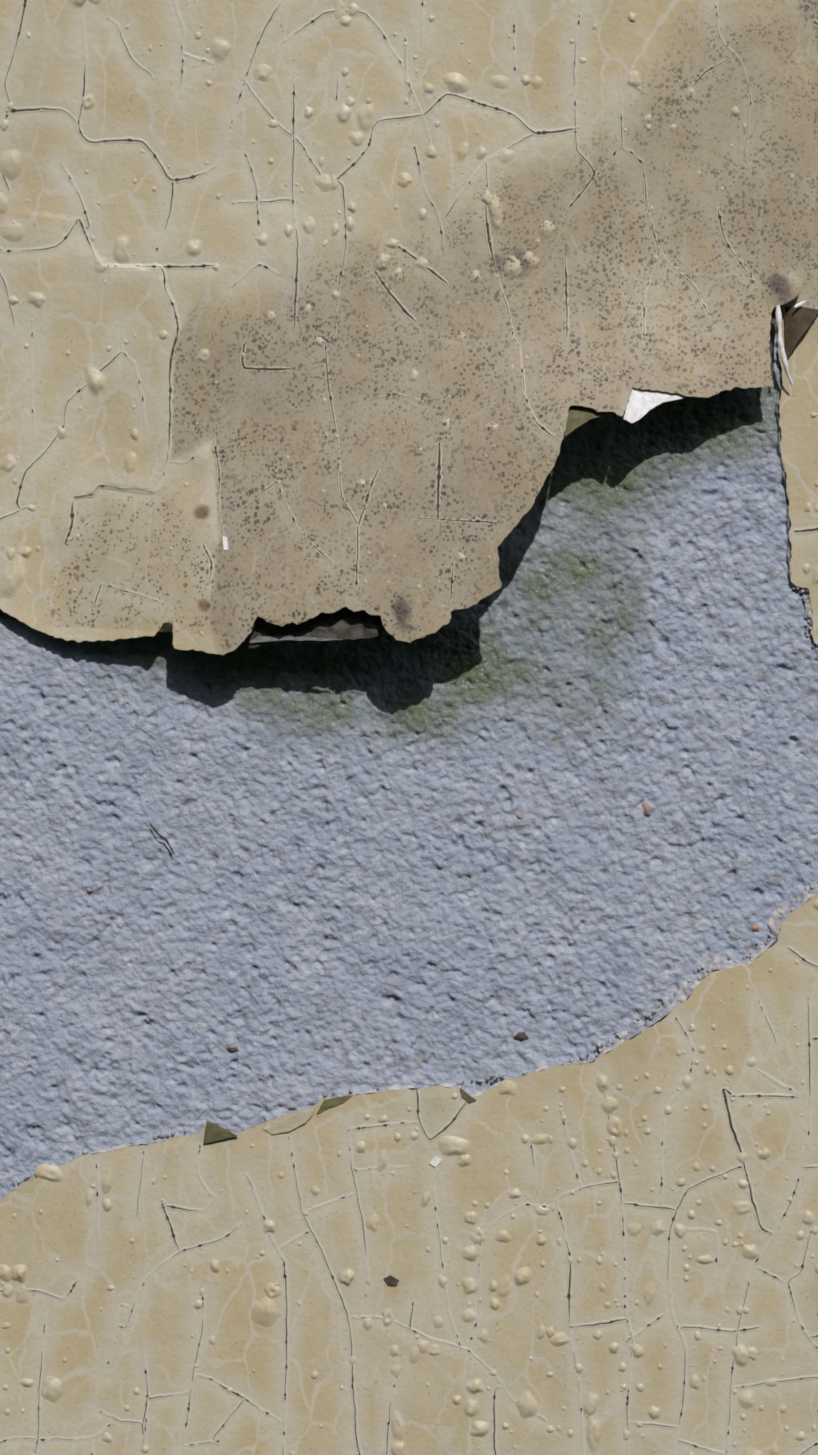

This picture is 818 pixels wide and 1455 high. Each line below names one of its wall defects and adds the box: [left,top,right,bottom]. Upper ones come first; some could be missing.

crack [0,0,712,605]
peeling [0,0,816,657]
spalling [0,323,818,1199]
crack [714,202,754,279]
crack [794,525,818,535]
crack [0,946,818,1455]